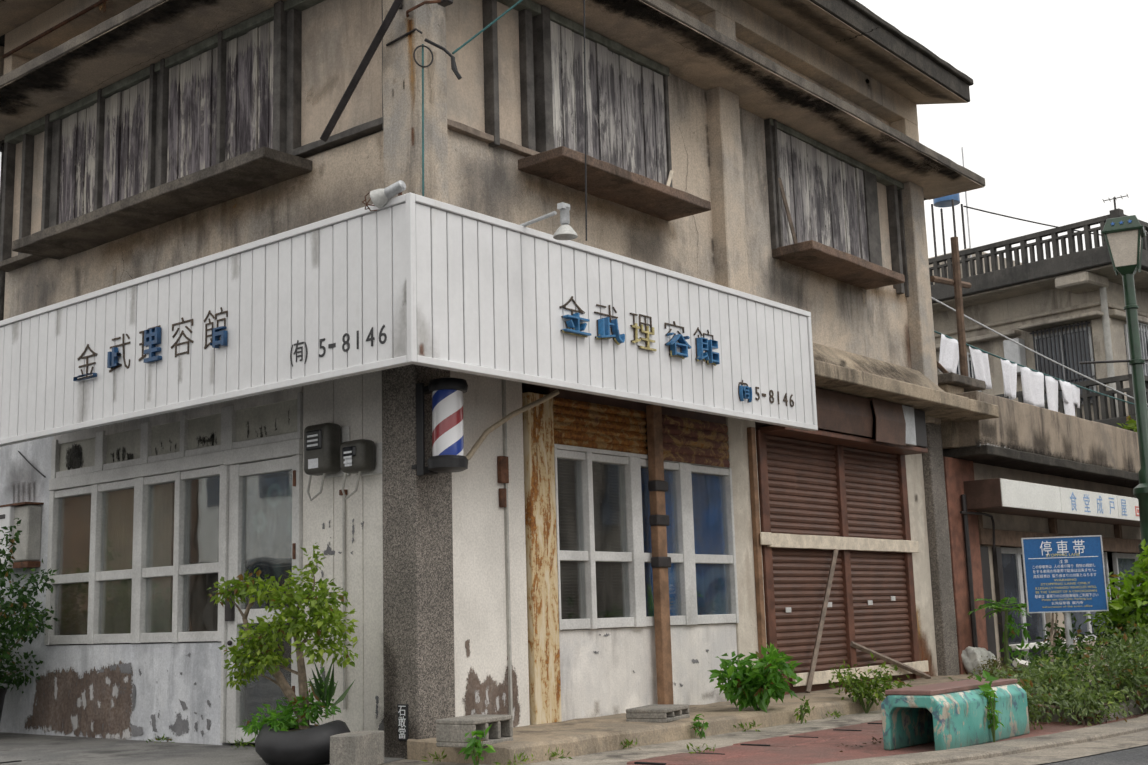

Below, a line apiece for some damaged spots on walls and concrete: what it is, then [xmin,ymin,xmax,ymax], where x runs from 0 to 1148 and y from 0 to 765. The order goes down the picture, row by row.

leakage [0,0,217,116]
leakage [595,0,961,180]
peeling [25,661,212,741]
peeling [462,639,520,727]